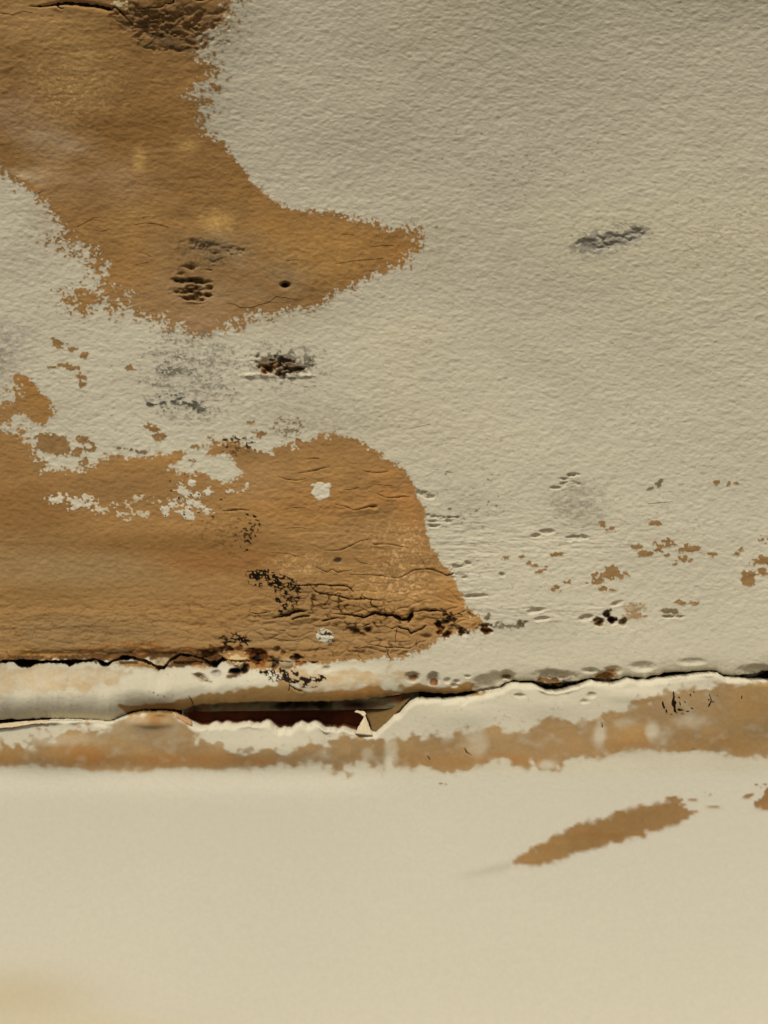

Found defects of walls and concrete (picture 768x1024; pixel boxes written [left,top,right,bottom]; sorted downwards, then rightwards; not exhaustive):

spalling [108,0,227,71]
spalling [568,216,654,260]
spalling [166,236,254,303]
peeling [26,432,98,472]
peeling [113,485,215,522]
peeling [629,519,718,567]
crack [1,539,454,691]
crack [0,717,52,725]
crack [114,697,194,722]
spalling [171,669,528,736]
crack [419,670,768,700]
leakage [510,791,724,870]